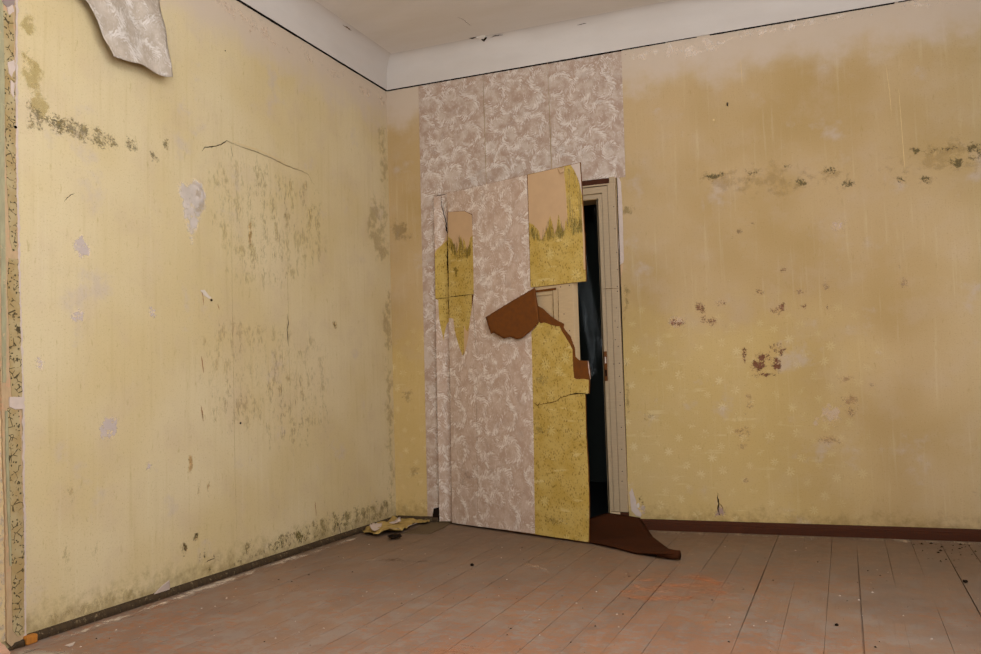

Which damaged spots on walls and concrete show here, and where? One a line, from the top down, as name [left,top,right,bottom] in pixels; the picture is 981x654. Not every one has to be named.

peeling [7,60,15,99]
water stain [27,102,137,151]
water stain [934,142,981,168]
peeling [9,397,24,410]